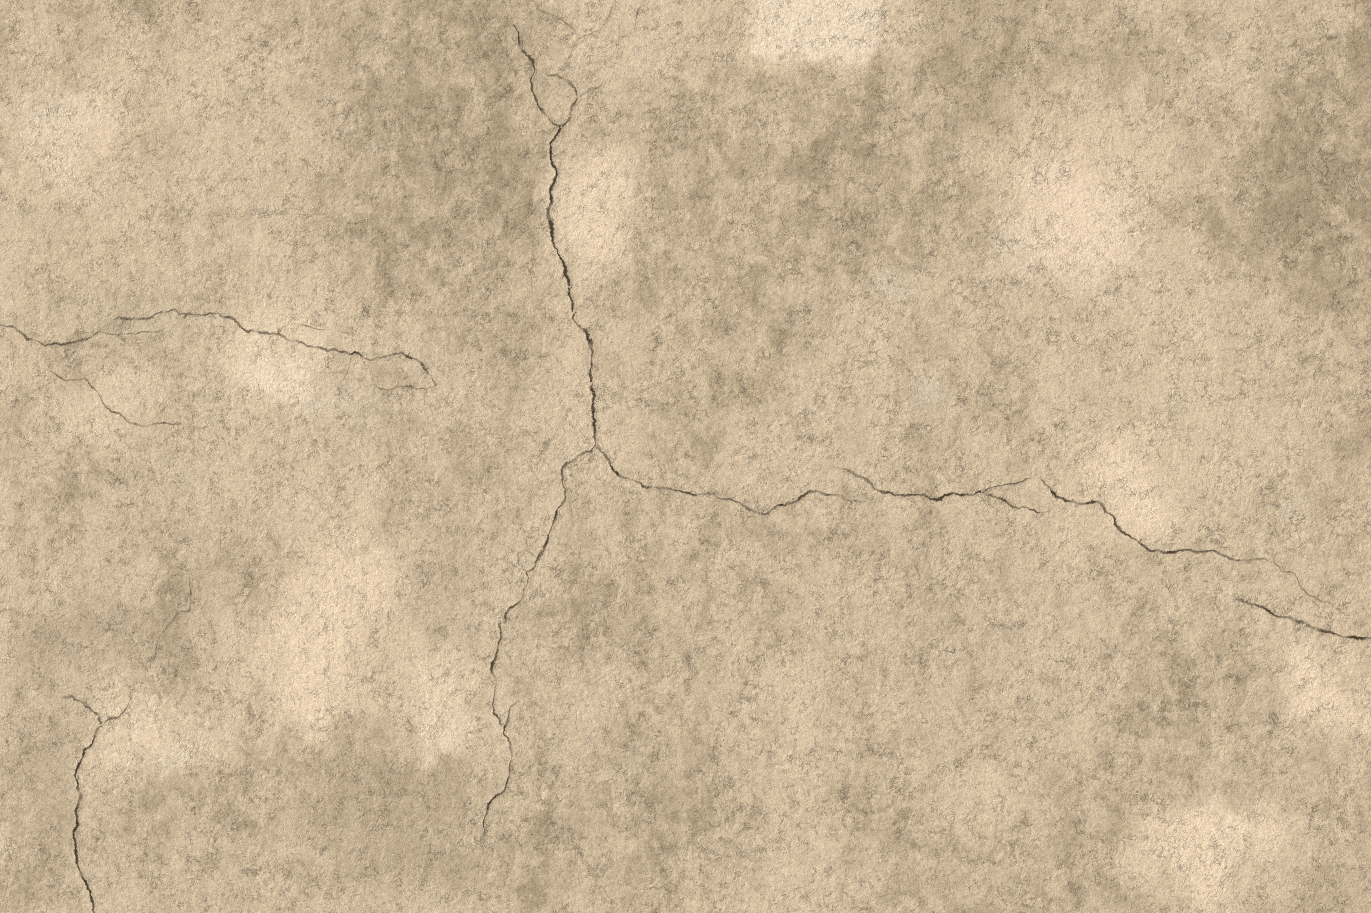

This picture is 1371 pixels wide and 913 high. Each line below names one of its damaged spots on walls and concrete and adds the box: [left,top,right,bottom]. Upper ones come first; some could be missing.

crack [0,306,439,430]
crack [479,0,1371,837]
crack [60,692,131,913]